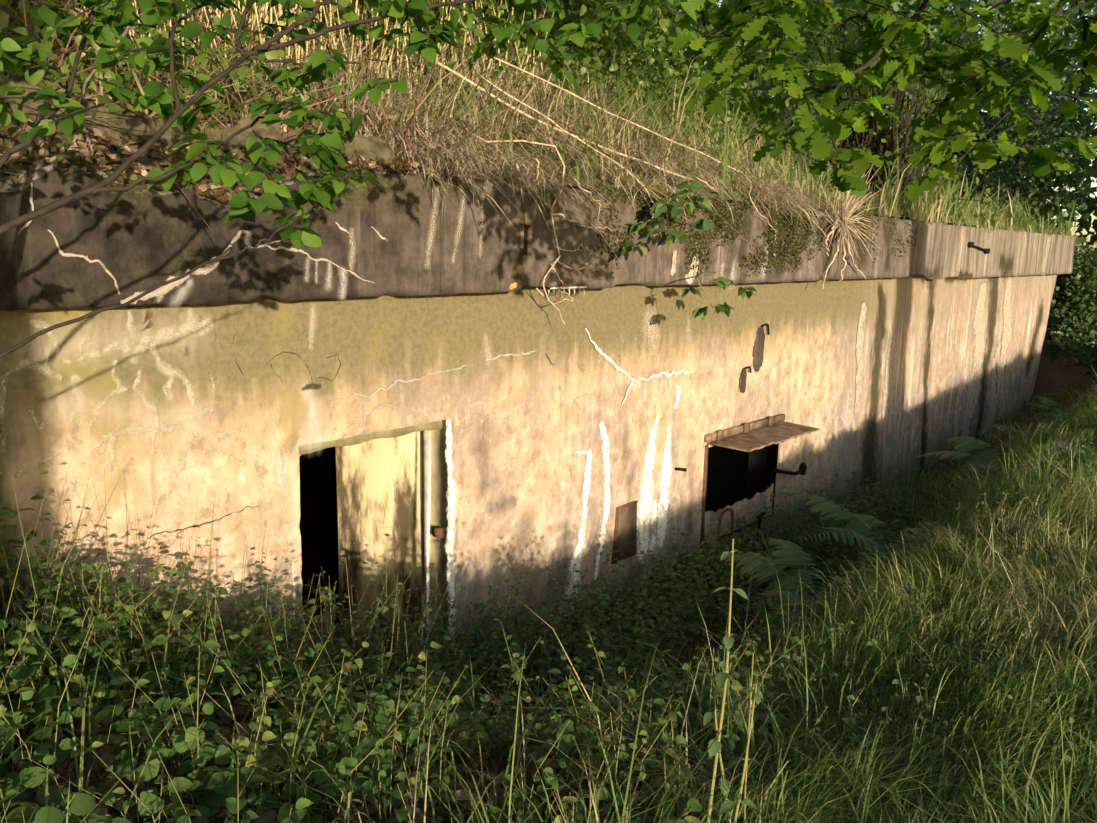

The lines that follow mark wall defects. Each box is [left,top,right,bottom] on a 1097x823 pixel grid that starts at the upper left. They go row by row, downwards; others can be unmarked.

crack [18,183,375,304]
crack [335,222,385,239]
crack [214,315,597,436]
crack [586,329,694,405]
crack [148,506,252,539]
efflorescence [562,422,610,612]
efflorescence [636,415,672,563]